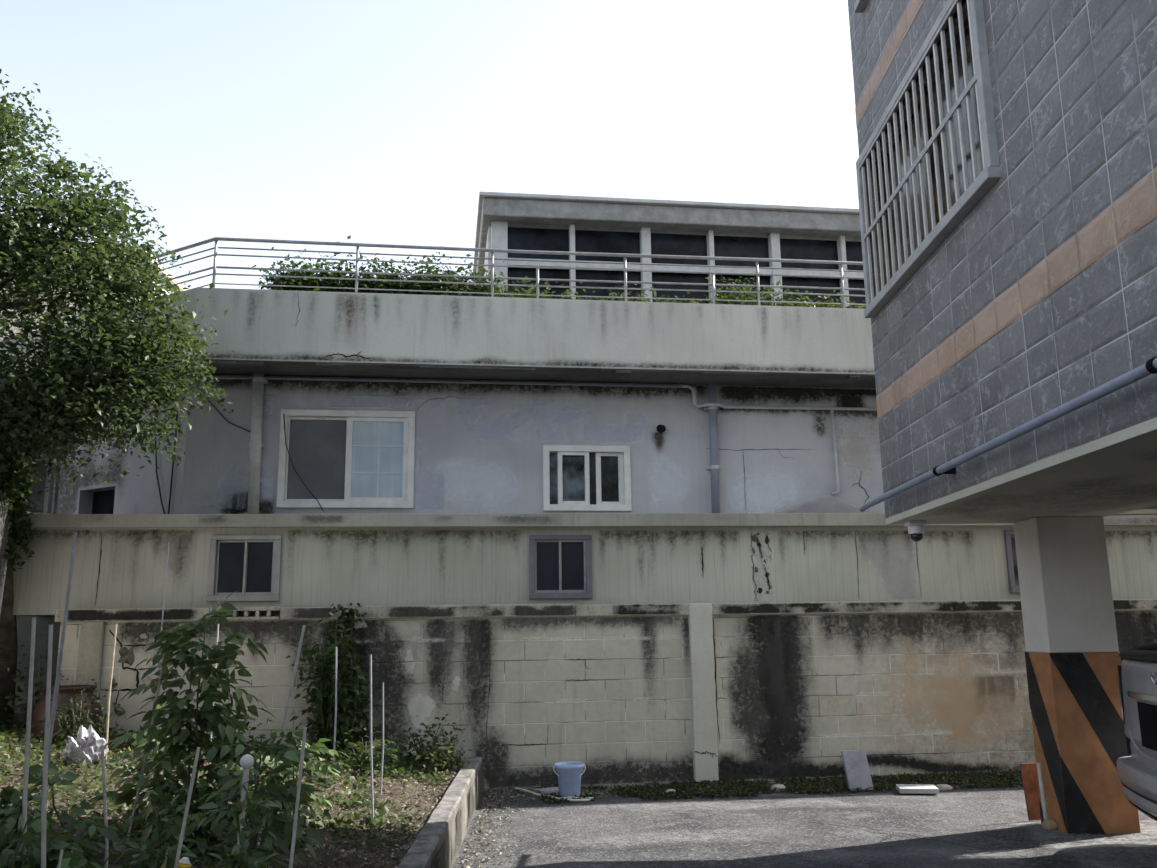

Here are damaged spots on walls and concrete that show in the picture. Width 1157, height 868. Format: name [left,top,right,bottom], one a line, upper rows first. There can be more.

leakage [16,438,123,514]
leakage [0,491,12,587]
leakage [34,530,187,569]
leakage [313,531,515,547]
peeling [751,532,772,602]
leakage [119,620,413,757]
leakage [425,617,694,820]
leakage [718,613,1024,780]